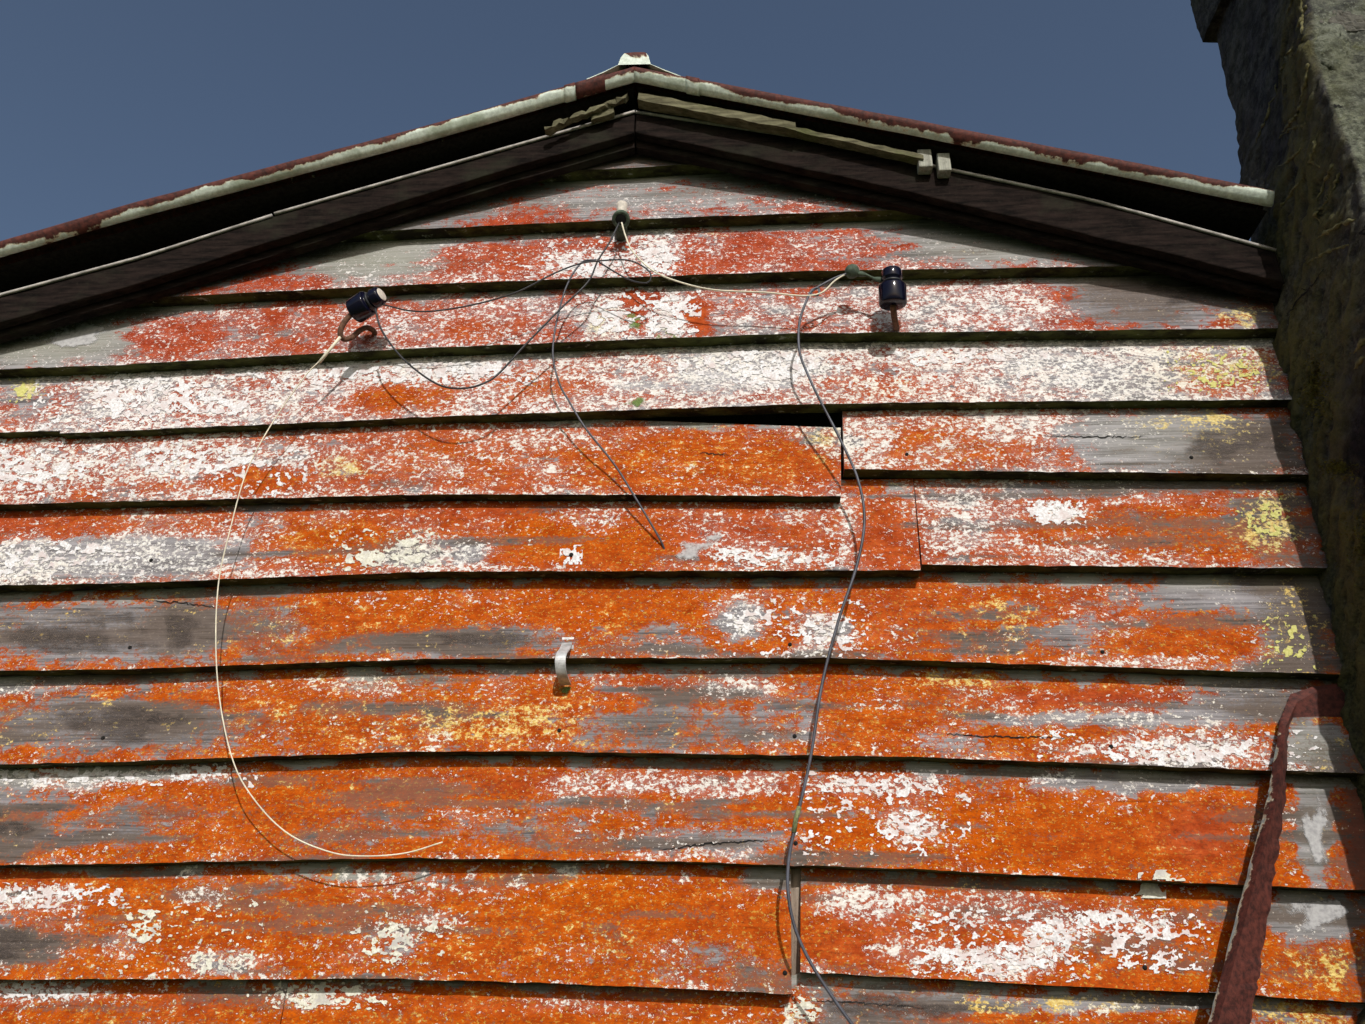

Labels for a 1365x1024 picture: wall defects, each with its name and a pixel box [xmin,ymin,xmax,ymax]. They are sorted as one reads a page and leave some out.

peeling [540,228,1087,394]
peeling [0,353,541,502]
peeling [327,528,444,573]
peeling [560,545,583,565]
peeling [713,547,835,570]
peeling [1027,500,1086,525]
peeling [712,599,869,657]
peeling [1035,730,1321,770]
peeling [796,770,971,856]
corrosion [1208,684,1345,1024]
peeling [0,882,475,1011]
peeling [909,870,1214,982]